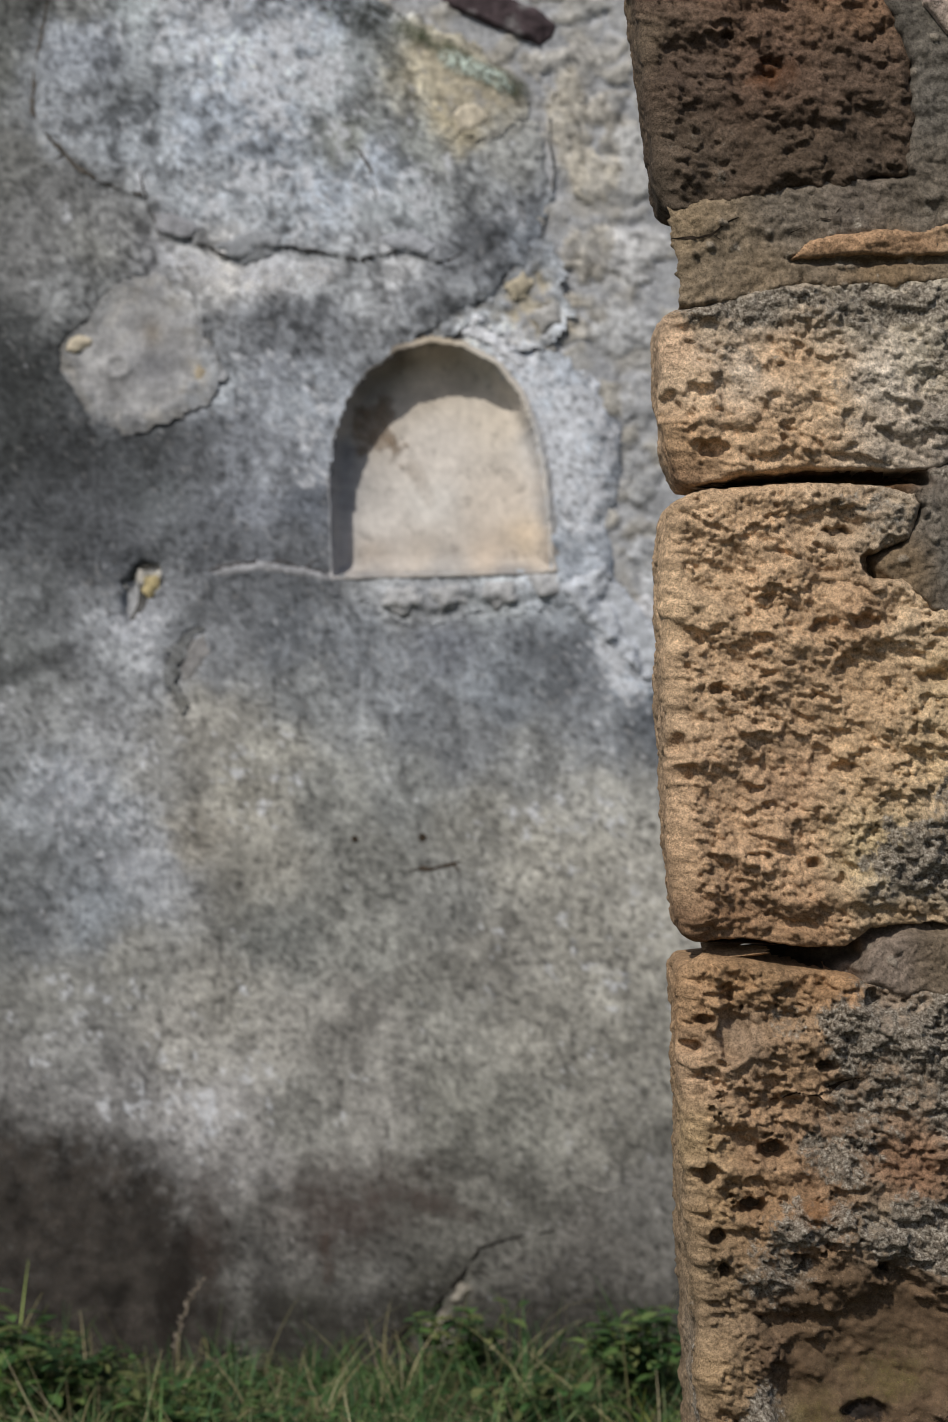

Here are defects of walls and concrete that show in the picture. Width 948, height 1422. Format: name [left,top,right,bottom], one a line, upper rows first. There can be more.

crack [24,0,142,196]
spalling [389,12,528,141]
flaking render [140,172,462,266]
crack [349,144,378,195]
spalling [59,271,229,435]
spalling [416,235,577,367]
spalling [123,562,164,621]
water stain [0,1124,229,1377]
crack [396,1229,554,1340]